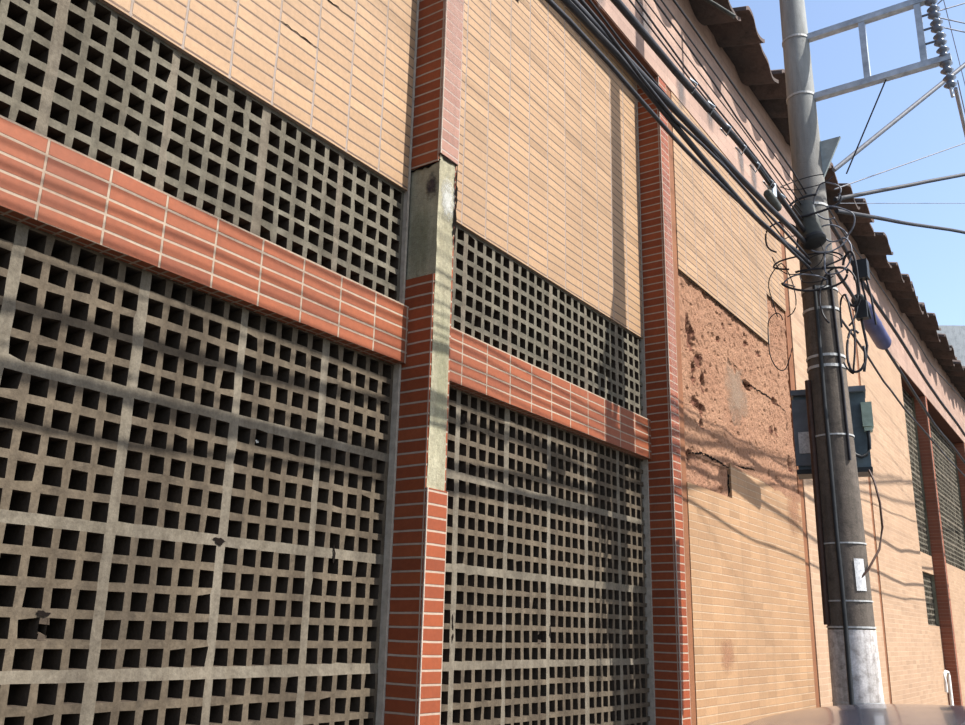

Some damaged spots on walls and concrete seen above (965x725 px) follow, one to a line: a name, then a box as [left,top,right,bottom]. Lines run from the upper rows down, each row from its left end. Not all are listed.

crack [688,452,755,496]
peeling [678,269,800,503]